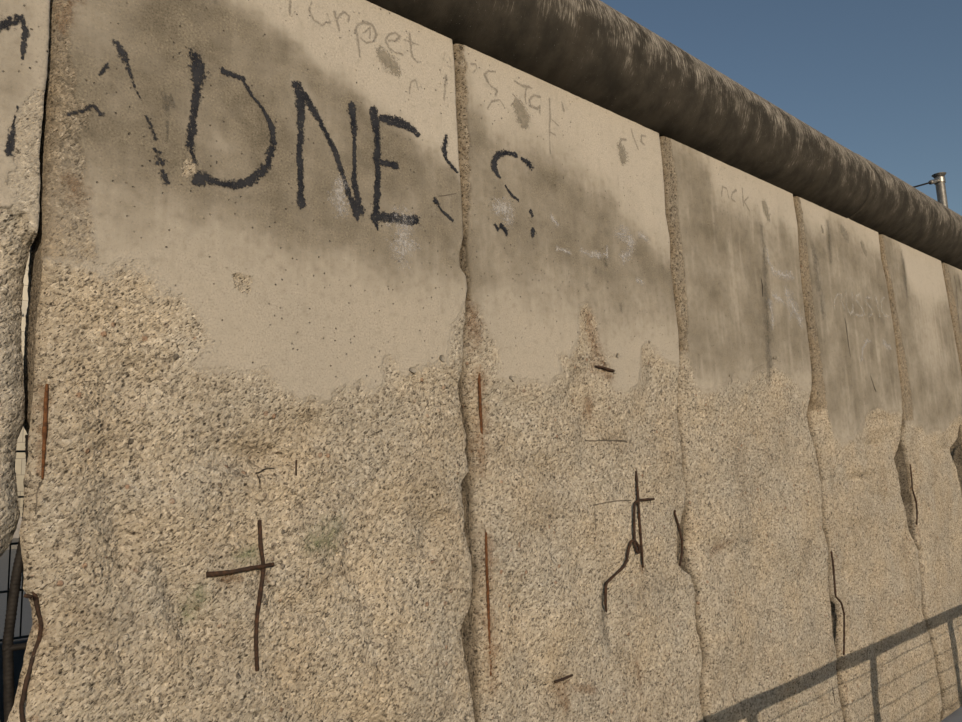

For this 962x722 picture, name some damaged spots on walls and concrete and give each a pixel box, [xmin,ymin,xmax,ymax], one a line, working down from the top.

spalling [0,90,44,557]
rust [41,384,49,479]
spalling [7,0,475,722]
spalling [461,136,962,722]
rust [2,537,44,722]
rust [206,520,275,671]
rust [604,471,655,612]
rust [830,551,845,655]